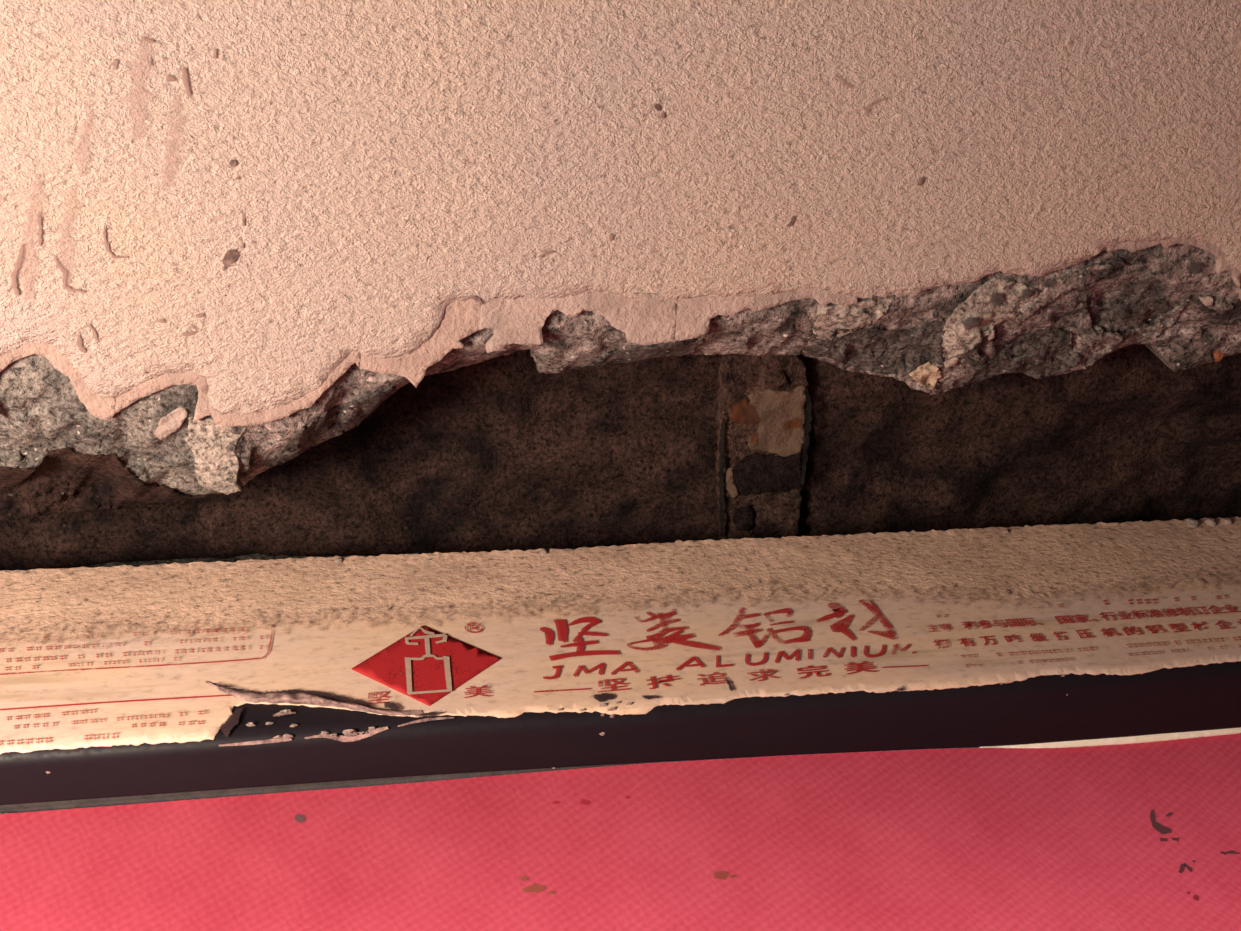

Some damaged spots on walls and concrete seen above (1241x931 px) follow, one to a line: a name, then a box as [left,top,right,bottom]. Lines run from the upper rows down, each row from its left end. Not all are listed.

spalling [0,237,1241,521]